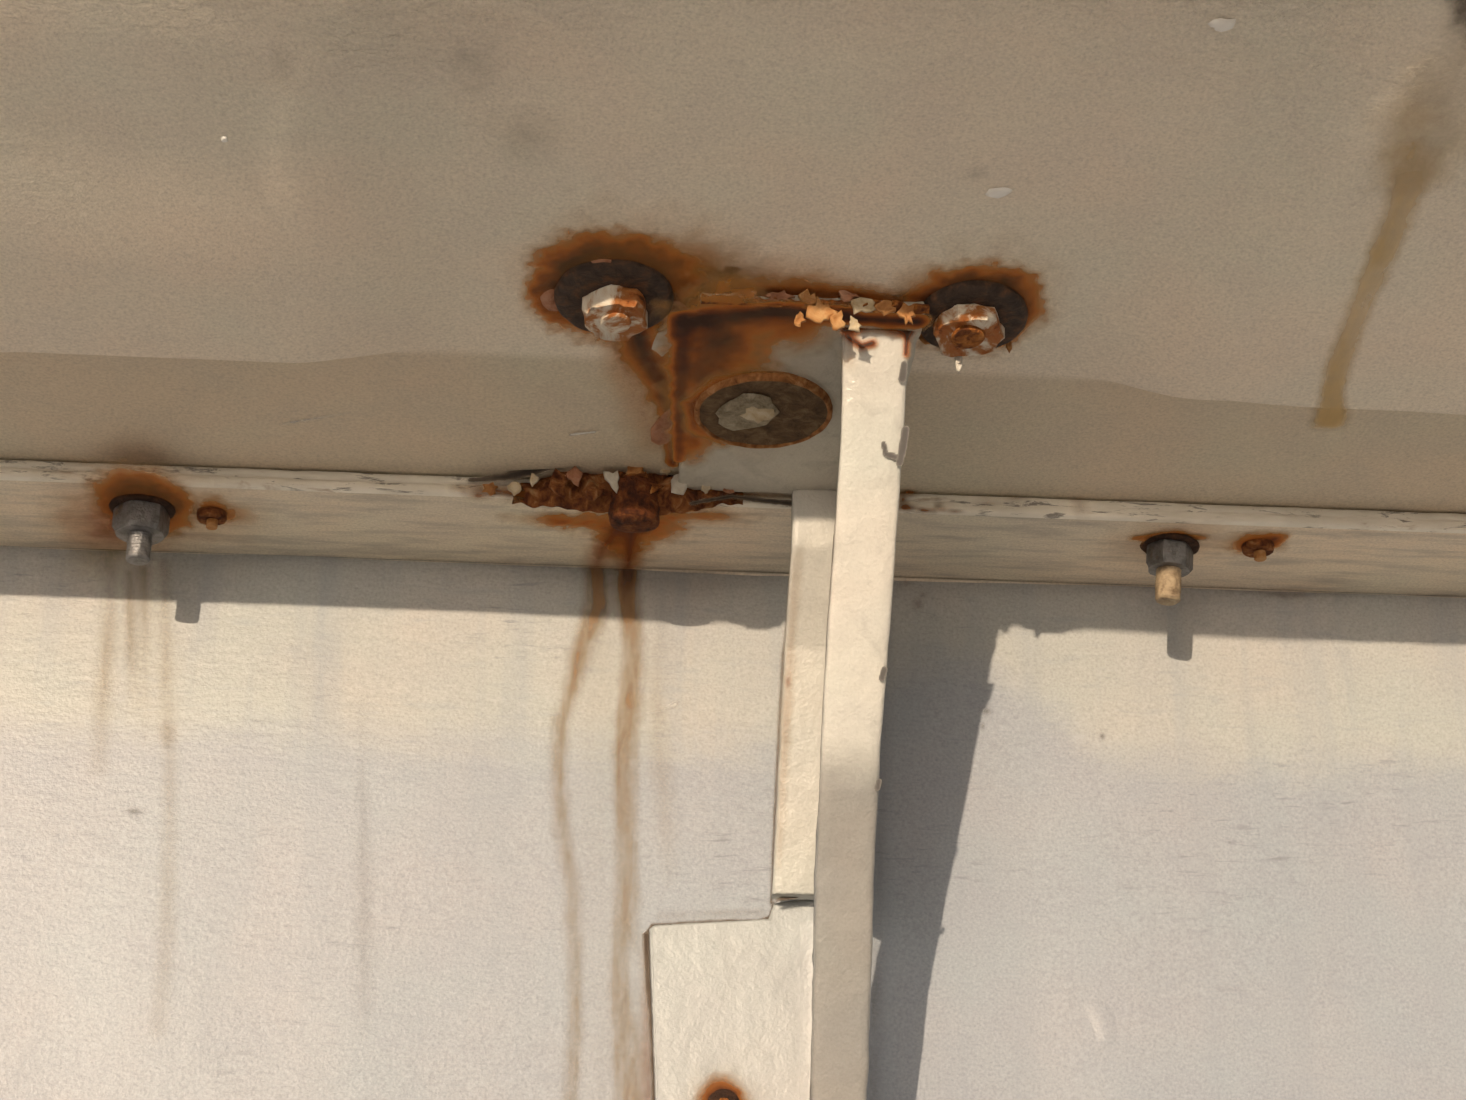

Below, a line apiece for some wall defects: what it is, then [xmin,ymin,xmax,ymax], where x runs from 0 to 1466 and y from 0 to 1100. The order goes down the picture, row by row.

water stain [1315,173,1421,428]
rust [92,468,236,538]
rust [468,230,1046,790]
rust [1232,533,1289,552]
rust [698,1078,746,1100]